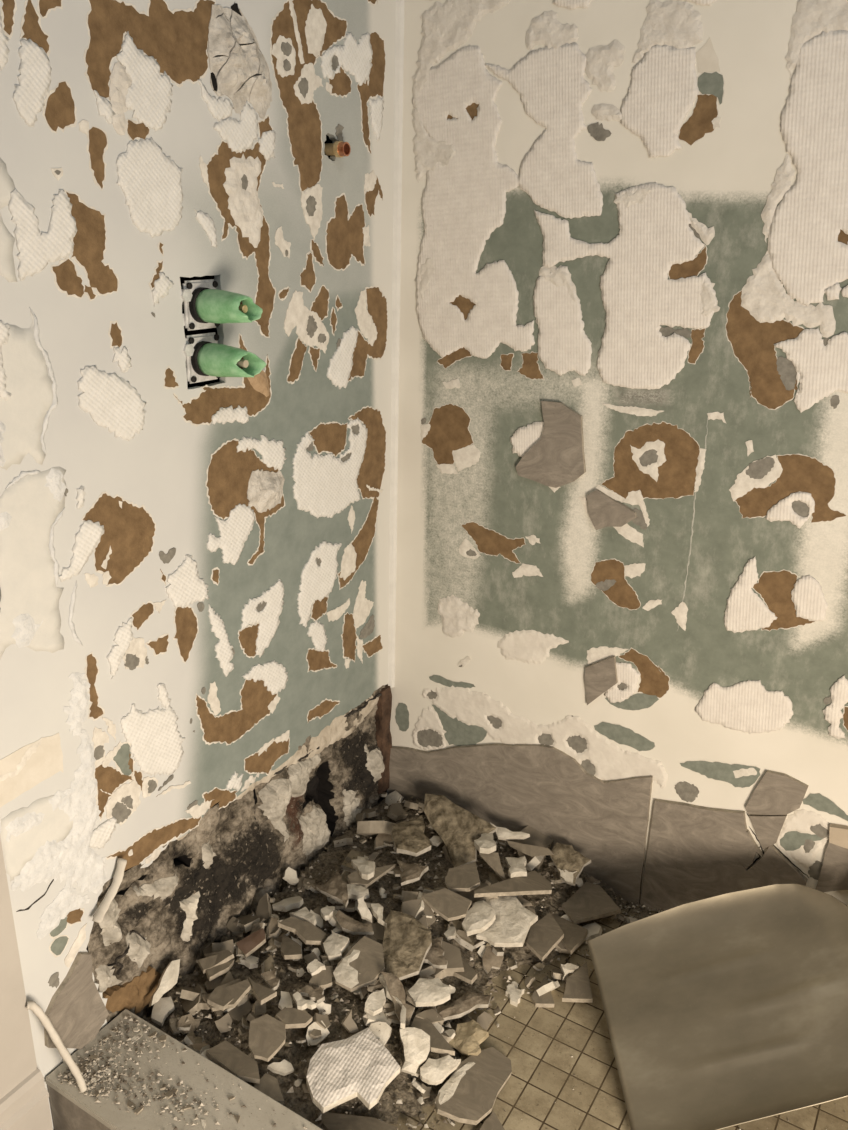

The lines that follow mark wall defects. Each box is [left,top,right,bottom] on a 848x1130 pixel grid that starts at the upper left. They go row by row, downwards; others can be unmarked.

peeling [8,0,388,389]
peeling [726,290,805,410]
peeling [420,403,481,474]
peeling [591,403,726,631]
peeling [729,440,847,529]
peeling [59,354,290,871]
peeling [306,496,383,672]
water stain [336,728,378,803]
peeling [594,721,656,751]
peeling [584,646,670,711]
peeling [675,760,761,802]
water stain [124,770,329,945]